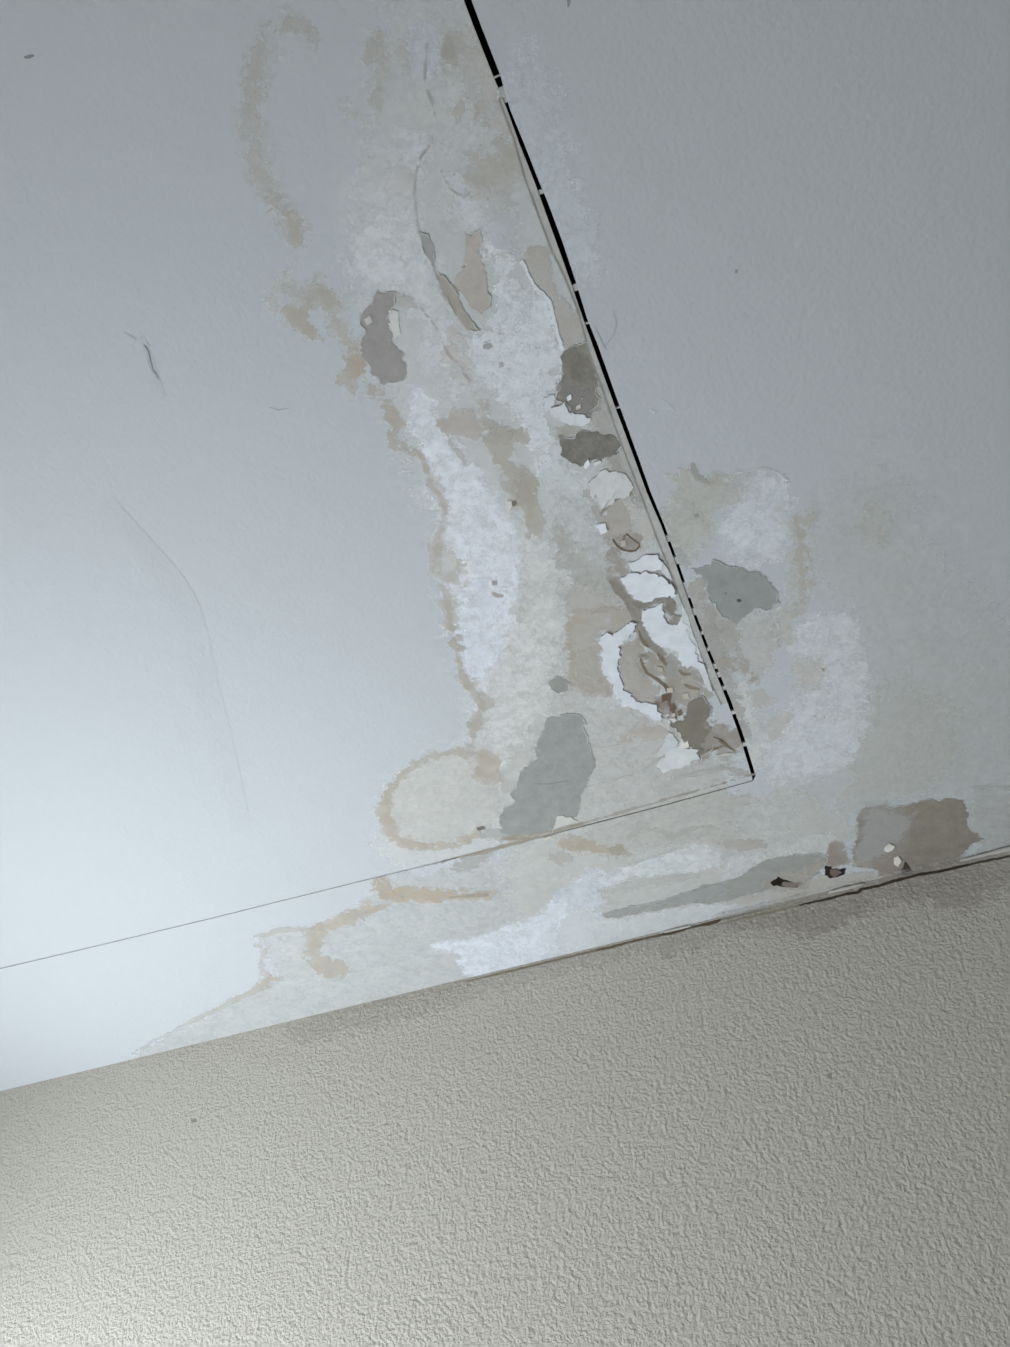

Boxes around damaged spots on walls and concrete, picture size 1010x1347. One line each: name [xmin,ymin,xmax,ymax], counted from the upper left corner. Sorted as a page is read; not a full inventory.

spalling [359,291,418,385]
spalling [419,229,493,382]
spalling [506,102,780,773]
damp [136,7,1010,1057]
spalling [476,713,596,843]
spalling [430,798,984,977]